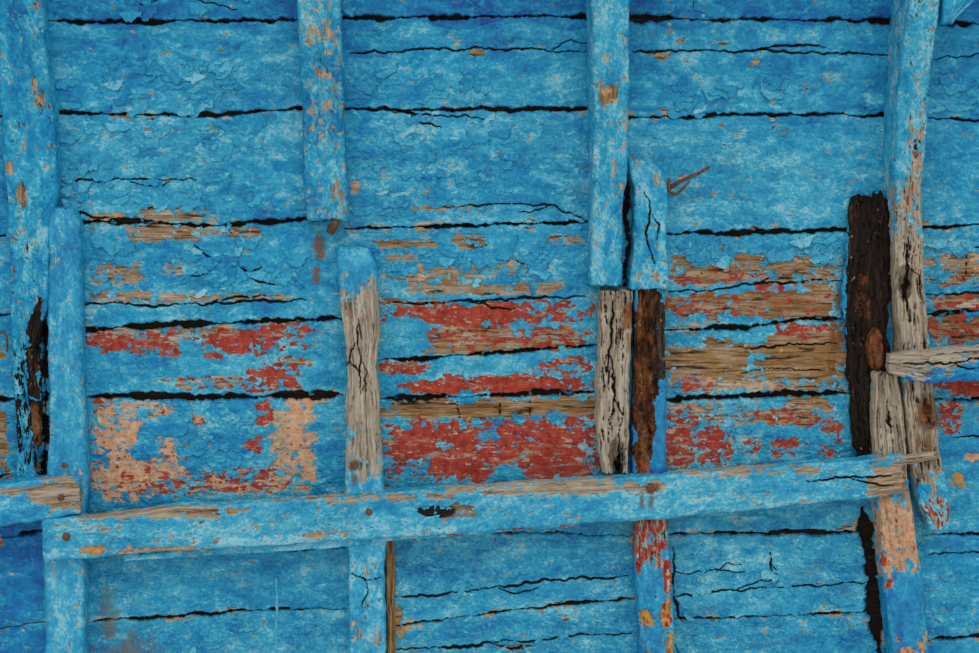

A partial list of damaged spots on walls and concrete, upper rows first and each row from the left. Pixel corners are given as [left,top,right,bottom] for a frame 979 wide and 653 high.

peeling [4,161,27,210]
peeling [371,233,603,485]
crack [602,177,660,442]
peeling [665,232,848,469]
peeling [0,394,38,480]
peeling [85,320,321,503]
peeling [933,381,979,435]
crack [395,575,628,598]
crack [396,633,631,650]
peeling [637,559,699,653]
crack [672,550,870,623]
peeling [890,630,928,653]